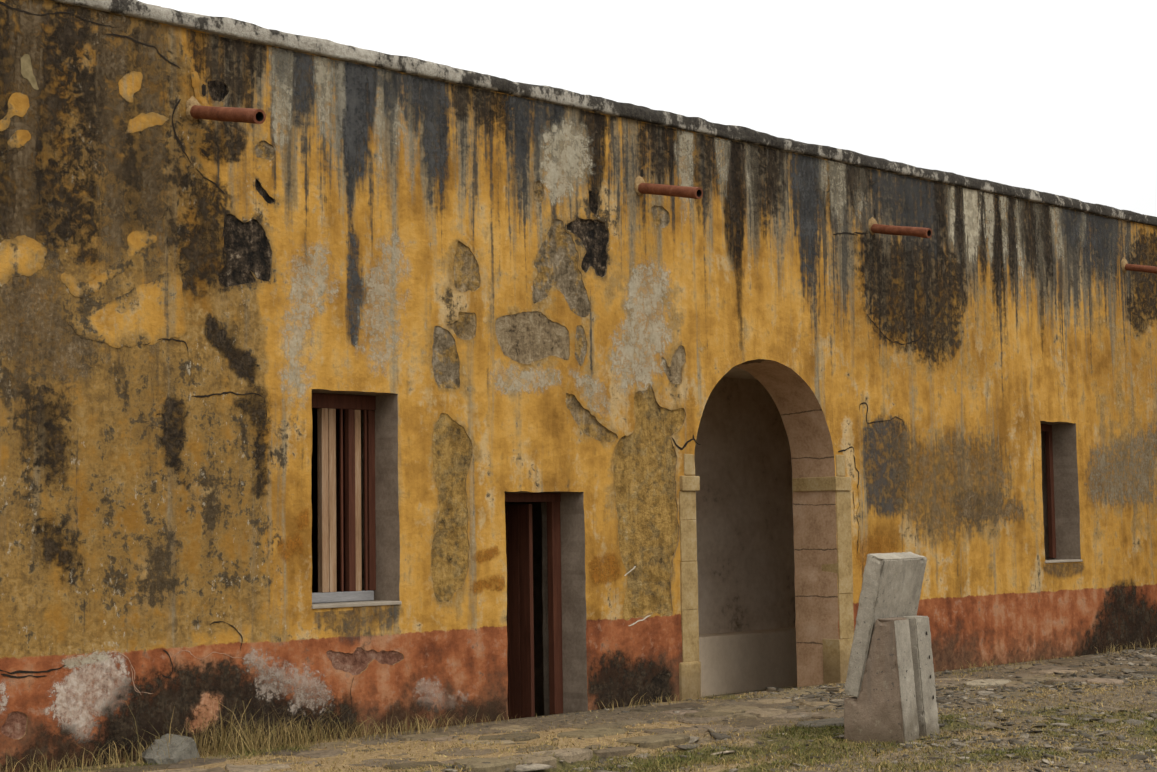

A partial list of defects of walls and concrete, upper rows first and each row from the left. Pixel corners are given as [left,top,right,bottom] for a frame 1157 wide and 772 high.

damp [168,176,233,297]
damp [205,313,272,496]
spalling [218,214,272,287]
damp [188,30,607,397]
spalling [431,413,473,603]
spalling [432,312,477,389]
spalling [495,191,609,366]
spalling [565,385,686,621]
damp [638,123,1157,366]
damp [863,417,1024,544]
crack [0,665,66,678]
damp [0,651,359,772]